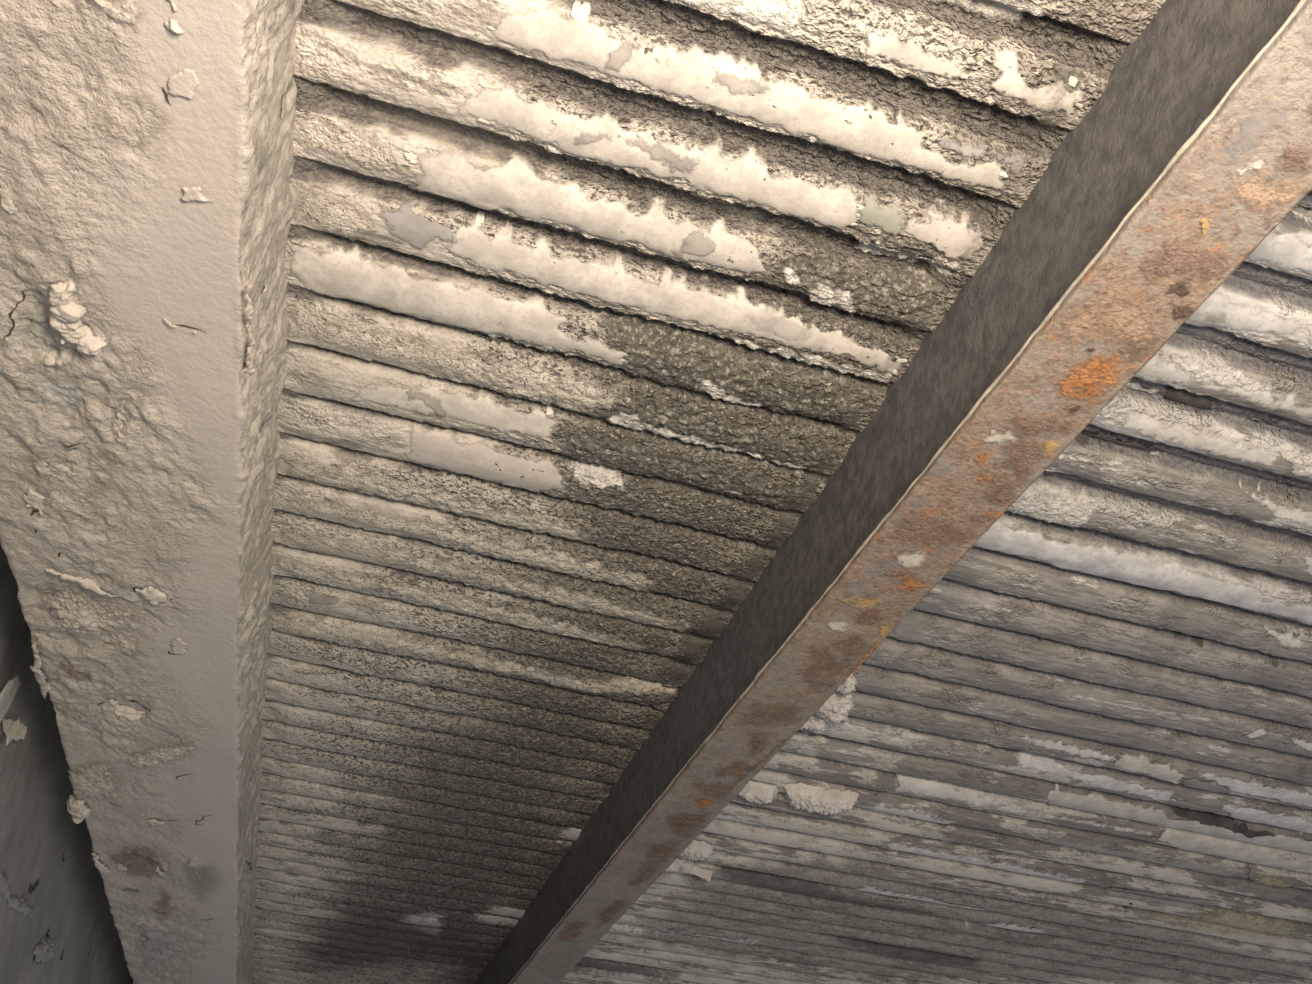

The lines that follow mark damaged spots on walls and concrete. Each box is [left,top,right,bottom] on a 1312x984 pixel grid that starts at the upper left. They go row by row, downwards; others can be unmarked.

peeling [476,0,1025,189]
peeling [991,49,1083,115]
peeling [459,73,984,259]
corrosion [1217,147,1312,211]
peeling [287,145,908,375]
corrosion [1059,288,1158,407]
corrosion [974,417,1071,483]
corrosion [843,597,890,676]
peeling [974,521,1312,648]
corrosion [672,734,785,827]
peeling [868,735,1312,874]
damp [572,957,680,977]